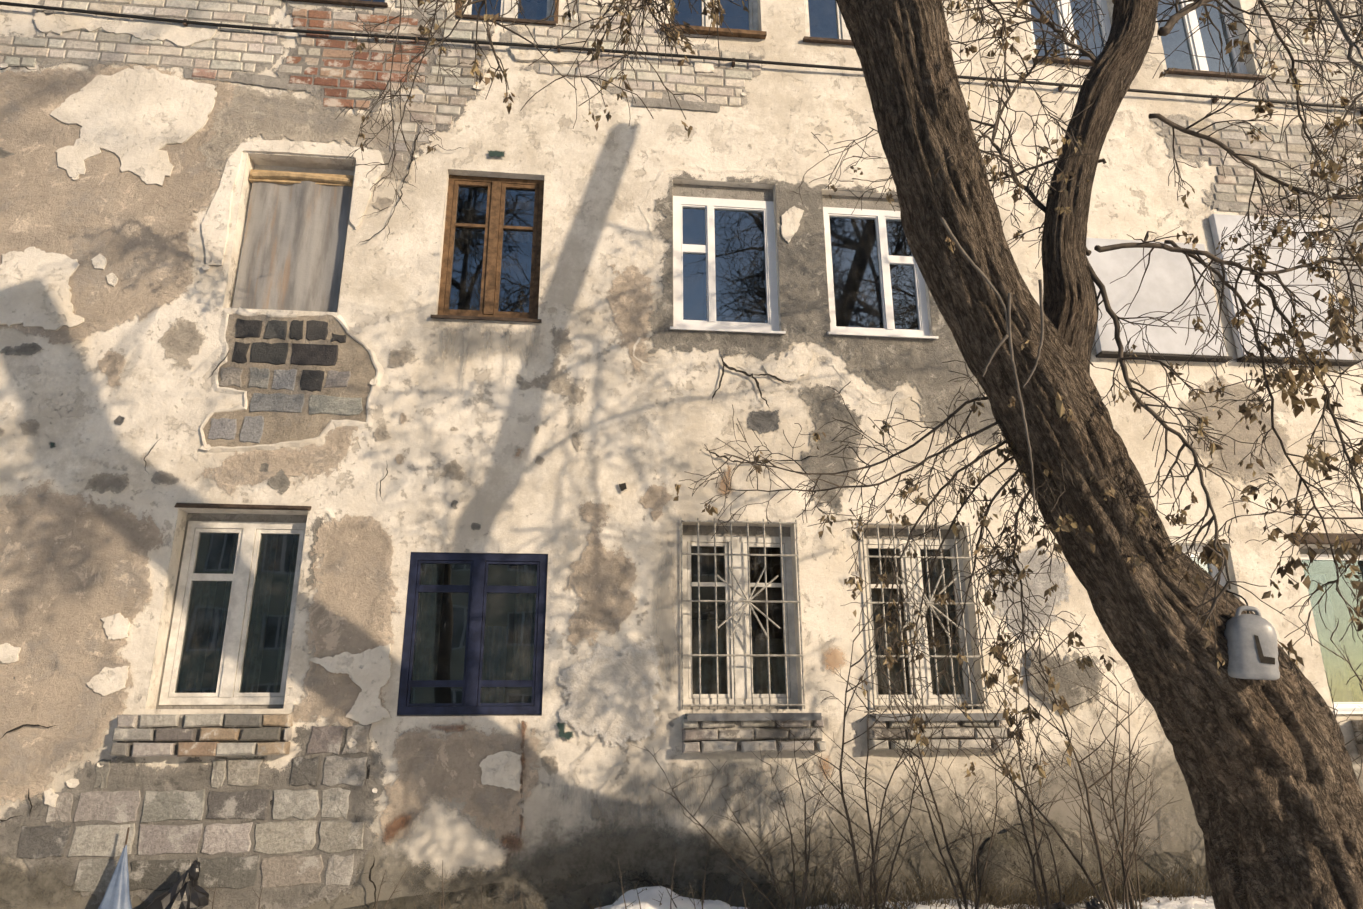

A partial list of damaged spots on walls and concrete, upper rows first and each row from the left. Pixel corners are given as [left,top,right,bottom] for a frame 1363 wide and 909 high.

flaking render [0,0,765,373]
flaking render [97,350,129,387]
spalling [370,347,415,385]
flaking render [517,326,587,406]
crack [0,724,58,739]
crack [0,789,33,822]
leakage [0,859,74,909]
leakage [399,765,837,903]
leakage [877,830,989,888]
leakage [1024,753,1177,851]